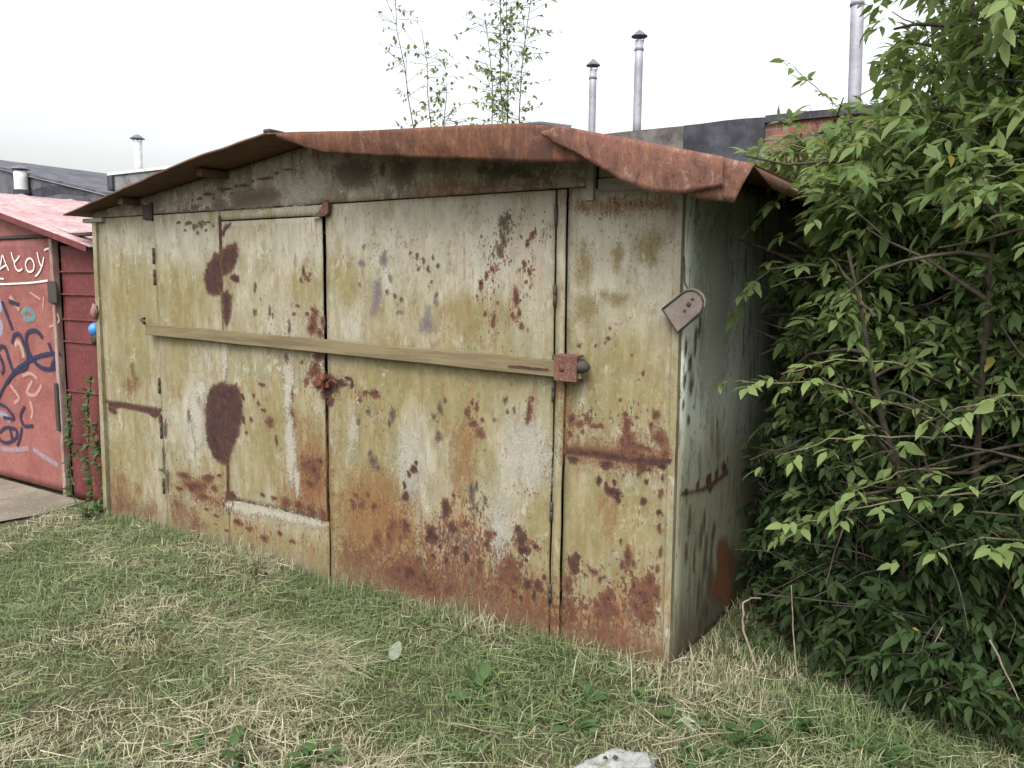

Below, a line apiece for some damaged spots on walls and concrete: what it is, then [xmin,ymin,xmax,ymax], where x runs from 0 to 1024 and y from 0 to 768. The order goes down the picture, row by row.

corrosion [520,229,536,283]
corrosion [284,353,380,425]
corrosion [224,518,295,544]
corrosion [260,493,327,521]
corrosion [300,455,323,489]
corrosion [369,517,410,552]
corrosion [402,460,418,501]
corrosion [388,494,497,598]
corrosion [494,525,546,602]
corrosion [564,398,672,622]
corrosion [681,460,728,496]
corrosion [709,537,733,611]